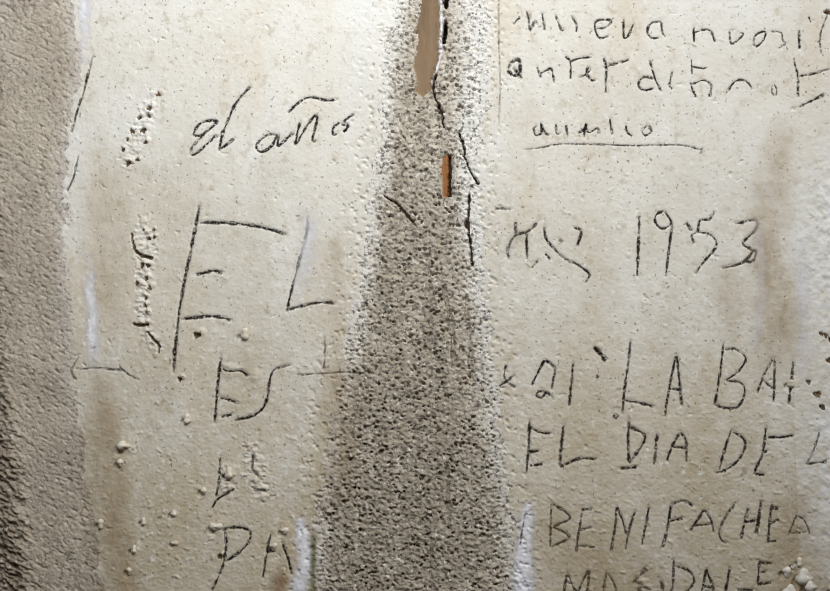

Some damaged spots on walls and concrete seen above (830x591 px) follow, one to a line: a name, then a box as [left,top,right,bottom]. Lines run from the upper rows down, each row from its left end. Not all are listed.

crack [442,0,450,44]
crack [433,75,479,266]
spalling [307,0,517,591]